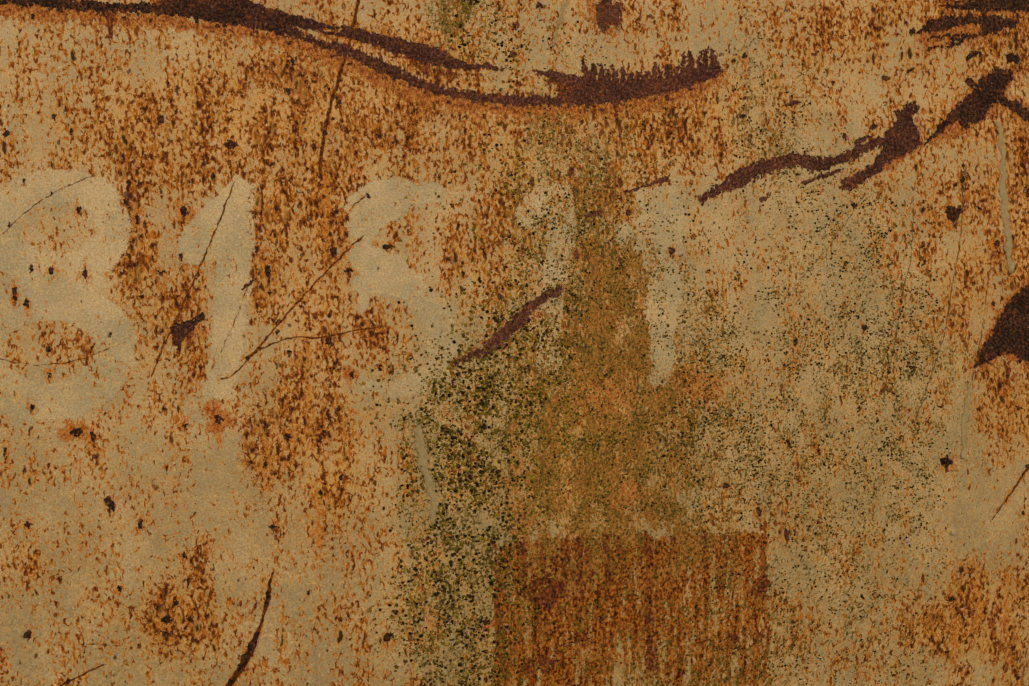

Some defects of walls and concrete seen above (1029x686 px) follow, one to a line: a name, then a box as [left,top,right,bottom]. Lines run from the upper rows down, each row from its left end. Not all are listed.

corrosion [0,0,773,686]
corrosion [695,23,1029,456]
corrosion [909,0,1029,64]
corrosion [877,545,1029,676]